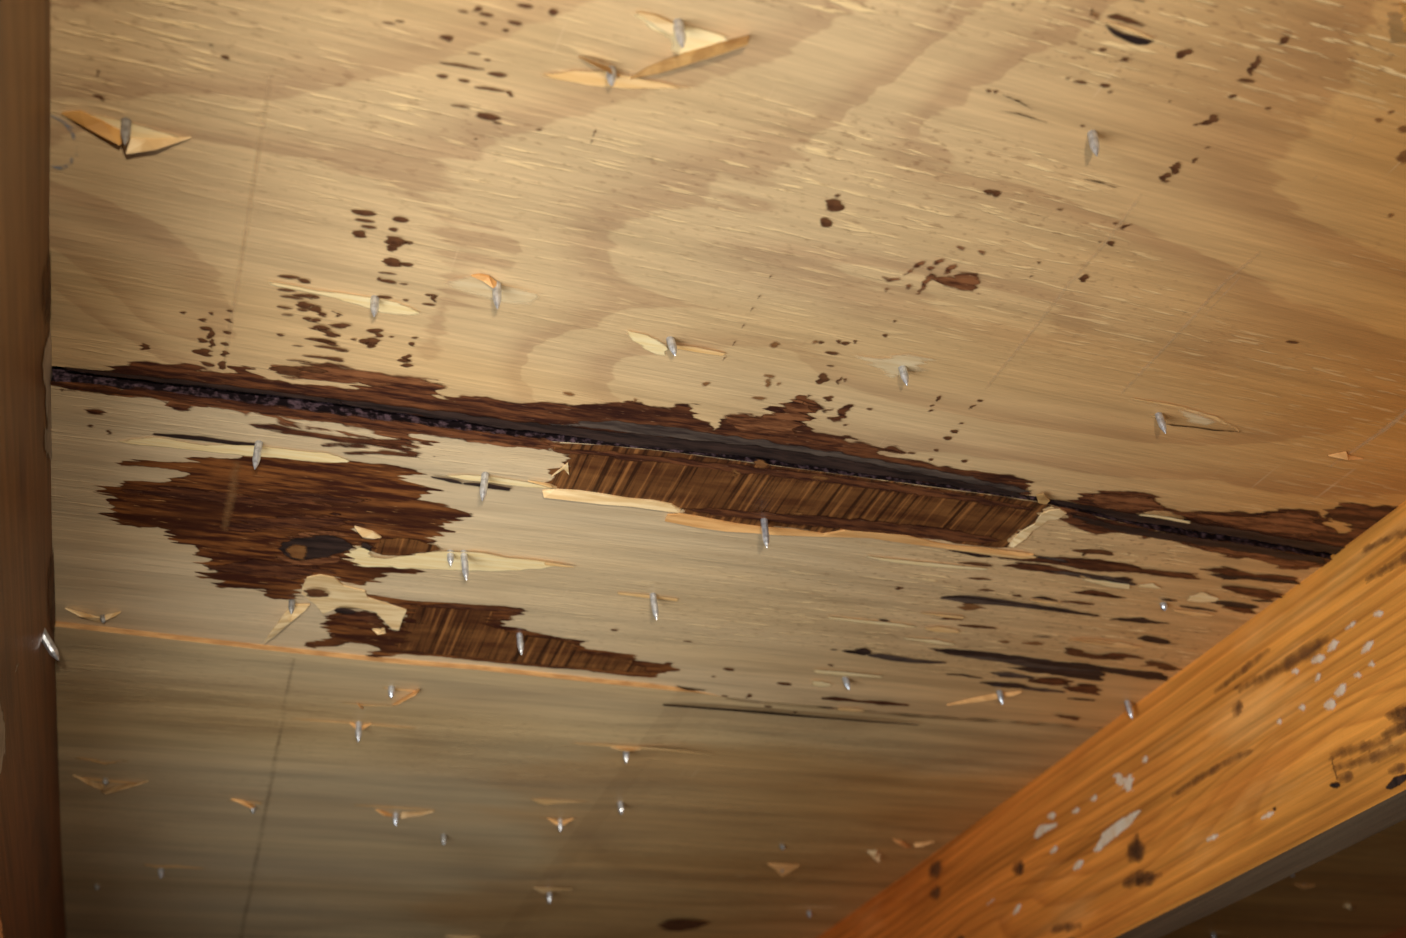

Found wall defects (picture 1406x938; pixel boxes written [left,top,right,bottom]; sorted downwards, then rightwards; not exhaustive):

water stain [351,210,437,306]
water stain [43,256,1034,511]
water stain [121,486,370,533]
spalling [431,476,511,491]
peeling [528,463,1067,557]
water stain [48,550,56,629]
water stain [203,559,336,580]
peeling [301,574,407,635]
water stain [683,491,1397,721]
water stain [1386,765,1406,790]